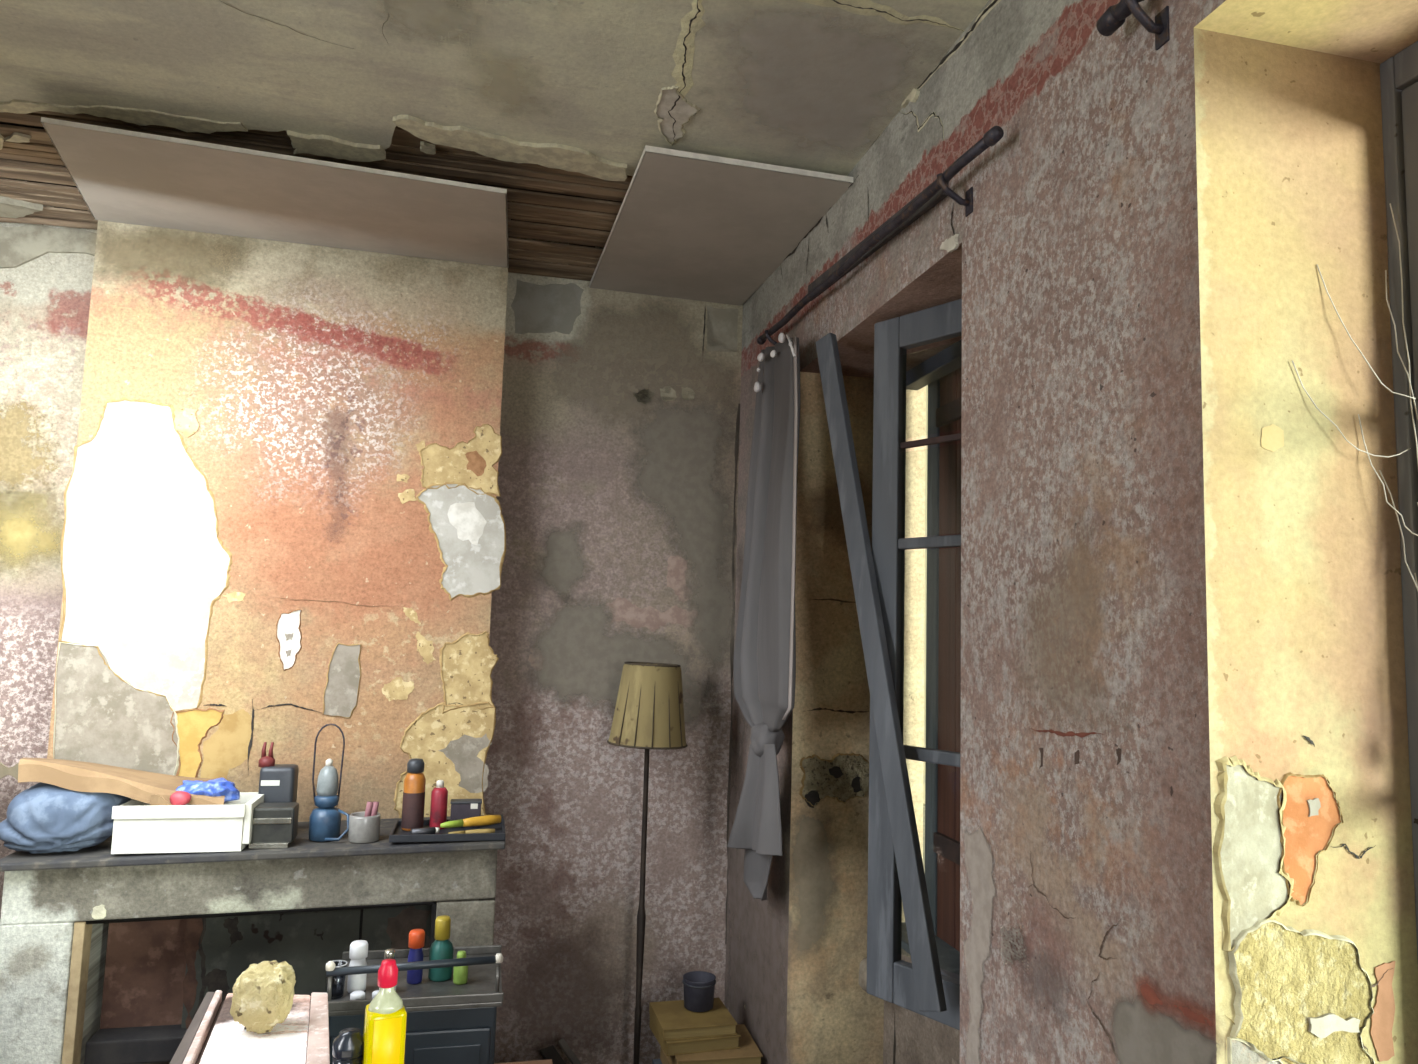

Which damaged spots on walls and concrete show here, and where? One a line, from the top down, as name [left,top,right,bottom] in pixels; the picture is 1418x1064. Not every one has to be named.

spalling [0,100,248,134]
spalling [392,115,627,181]
crack [668,0,706,146]
crack [798,0,1001,215]
leakage [0,402,61,565]
flaking render [58,397,252,779]
peeling [276,609,302,671]
flaking render [397,424,506,601]
leakage [532,308,735,724]
flaking render [1213,755,1395,1064]